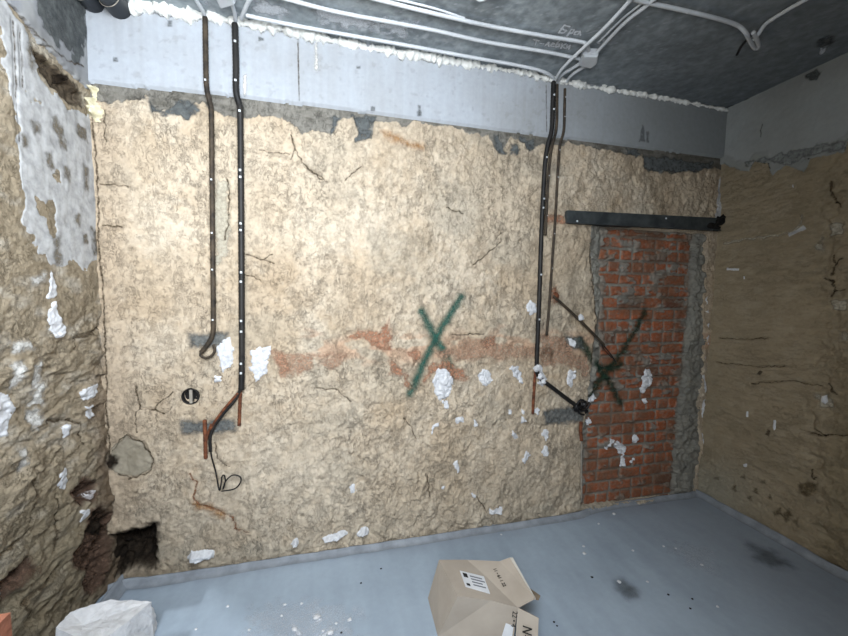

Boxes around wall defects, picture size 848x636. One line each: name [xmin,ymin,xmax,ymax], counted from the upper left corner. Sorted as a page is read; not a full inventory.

peeling [0,0,98,338]
crack [263,135,323,180]
crack [829,181,841,207]
crack [73,110,173,480]
crack [825,255,845,297]
crack [32,418,84,445]
crack [0,470,60,616]
spalling [57,468,113,595]